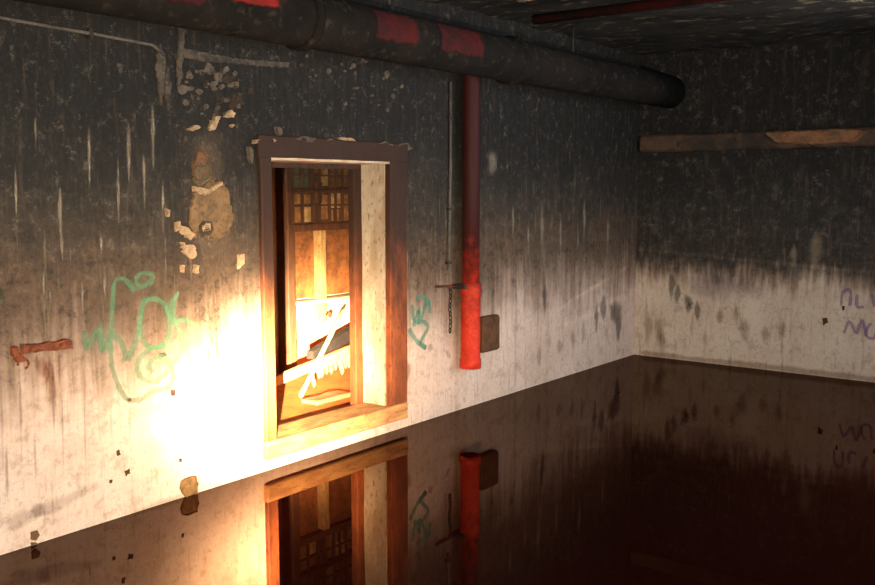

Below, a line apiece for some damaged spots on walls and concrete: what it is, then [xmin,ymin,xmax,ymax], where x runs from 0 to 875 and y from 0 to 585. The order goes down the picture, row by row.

flaking render [155,27,368,274]